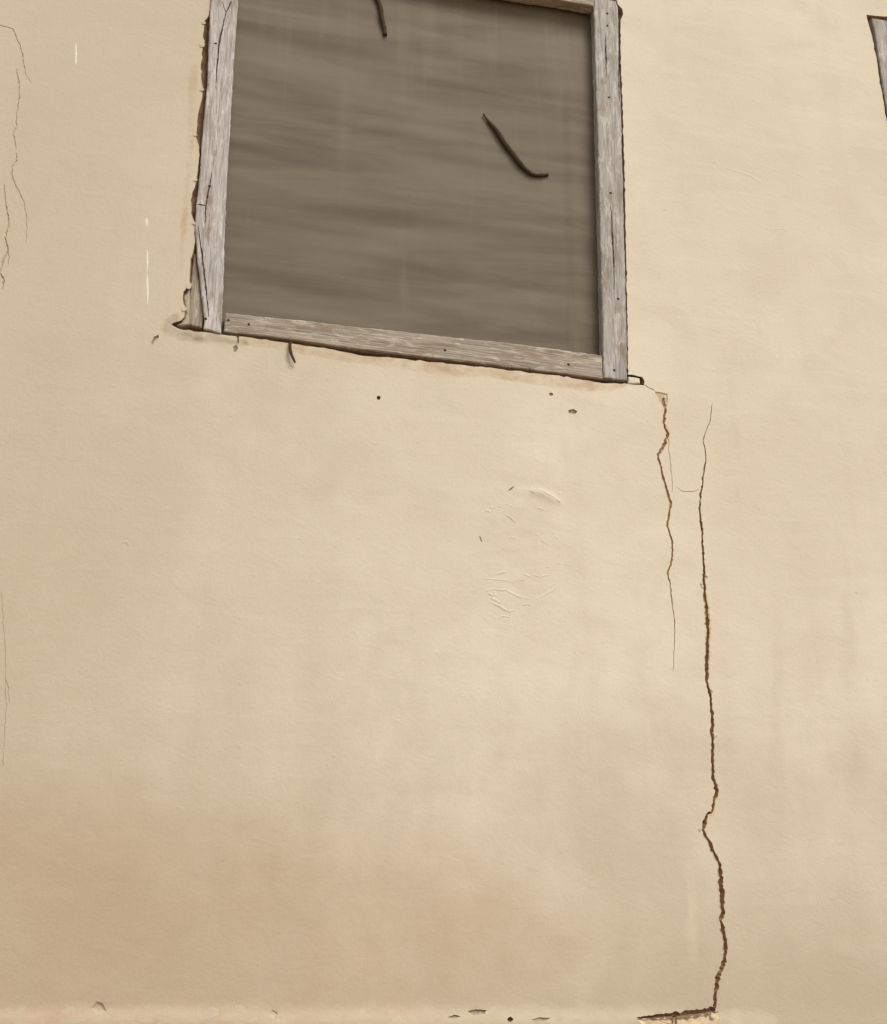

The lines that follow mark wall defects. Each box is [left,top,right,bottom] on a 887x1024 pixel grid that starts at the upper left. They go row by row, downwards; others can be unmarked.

crack [0,25,31,289]
flaking render [172,2,211,332]
flaking render [598,0,645,385]
flaking render [333,349,488,368]
crack [637,384,728,1024]